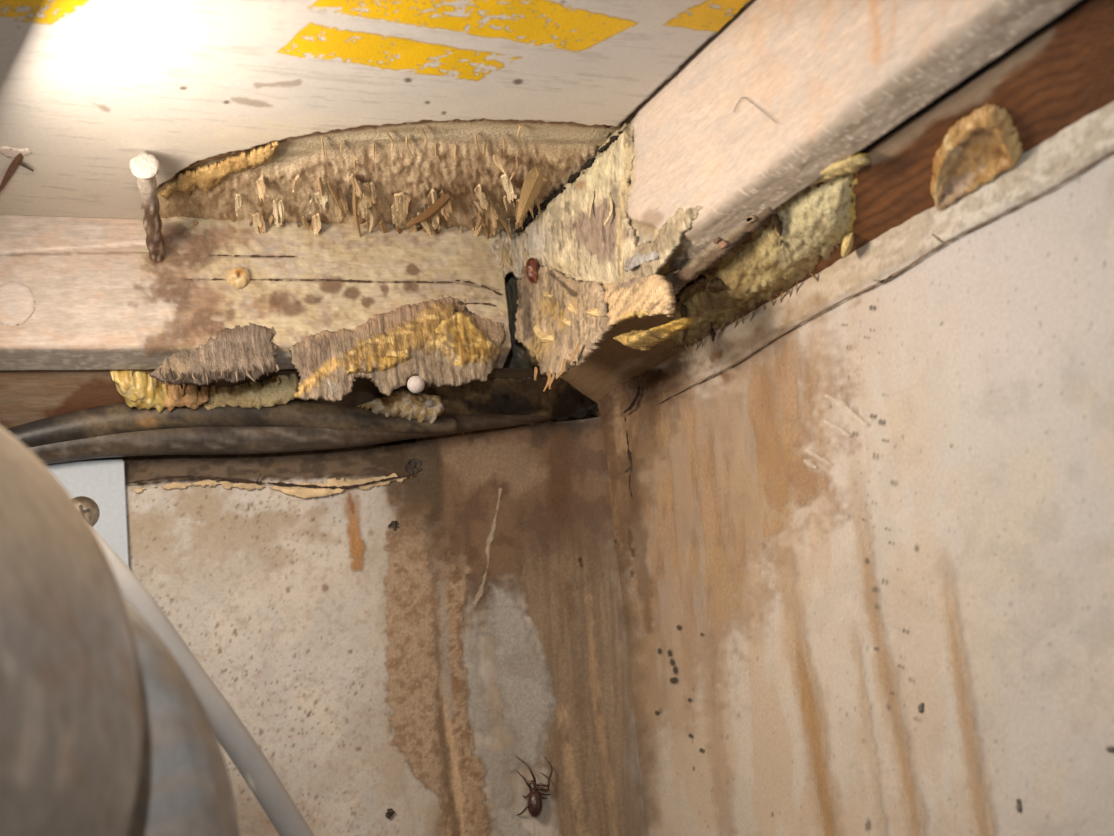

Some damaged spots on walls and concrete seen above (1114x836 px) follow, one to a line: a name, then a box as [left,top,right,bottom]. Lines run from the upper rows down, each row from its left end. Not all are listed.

damp [137,225,233,355]
peeling [533,321,554,343]
peeling [562,301,600,326]
damp [746,322,837,564]
corrosion [347,498,365,570]
damp [388,369,745,692]